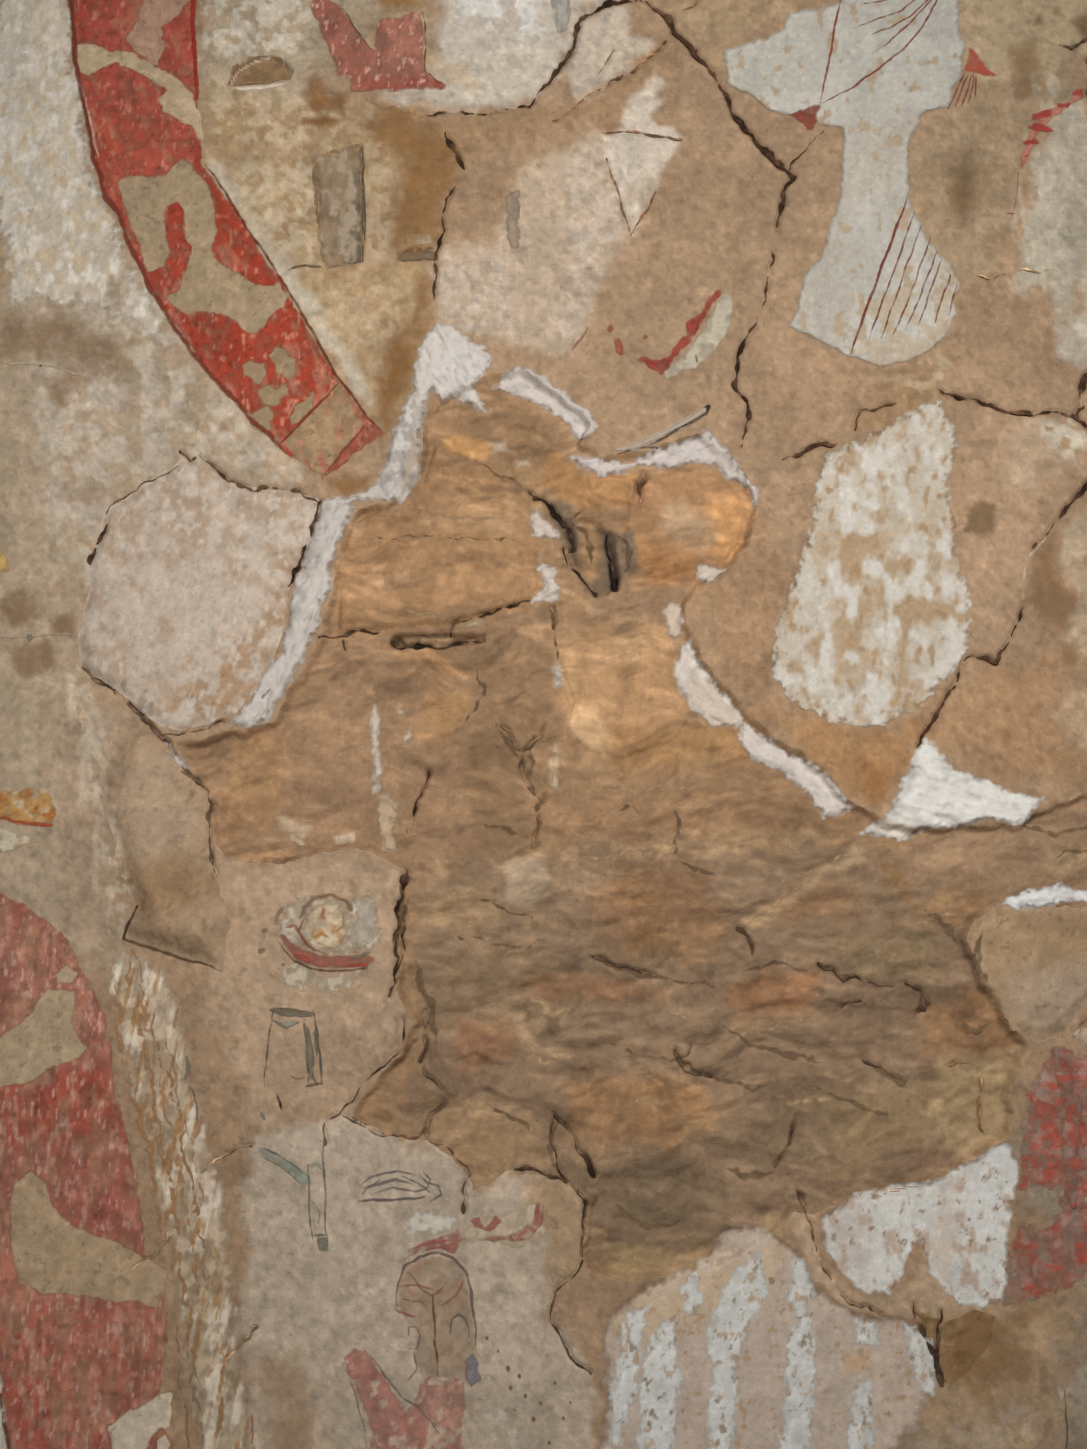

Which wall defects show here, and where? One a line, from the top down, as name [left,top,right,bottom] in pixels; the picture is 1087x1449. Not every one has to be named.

crack [1049,37,1087,49]
crack [413,0,824,447]
crack [87,450,321,587]
crack [528,491,618,596]
crack [637,471,646,503]
crack [782,402,896,460]
crack [939,372,1087,427]
crack [318,600,556,650]
crack [917,482,1087,748]
crack [0,633,226,878]
crack [500,724,545,847]
spalling [165,323,1087,1283]